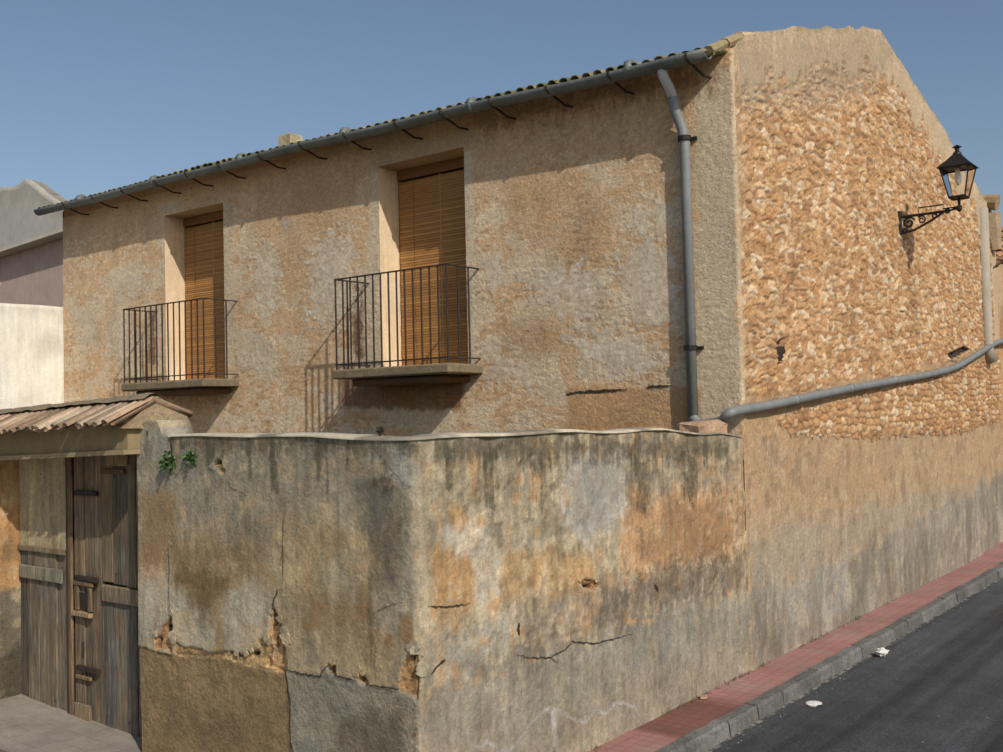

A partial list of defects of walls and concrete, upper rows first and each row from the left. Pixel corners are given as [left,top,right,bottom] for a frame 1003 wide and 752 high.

leakage [206,437,304,480]
leakage [435,433,729,511]
crack [272,512,285,610]
peeling [153,608,291,673]
spalling [398,641,429,699]
crack [517,623,632,662]
leakage [470,701,635,752]